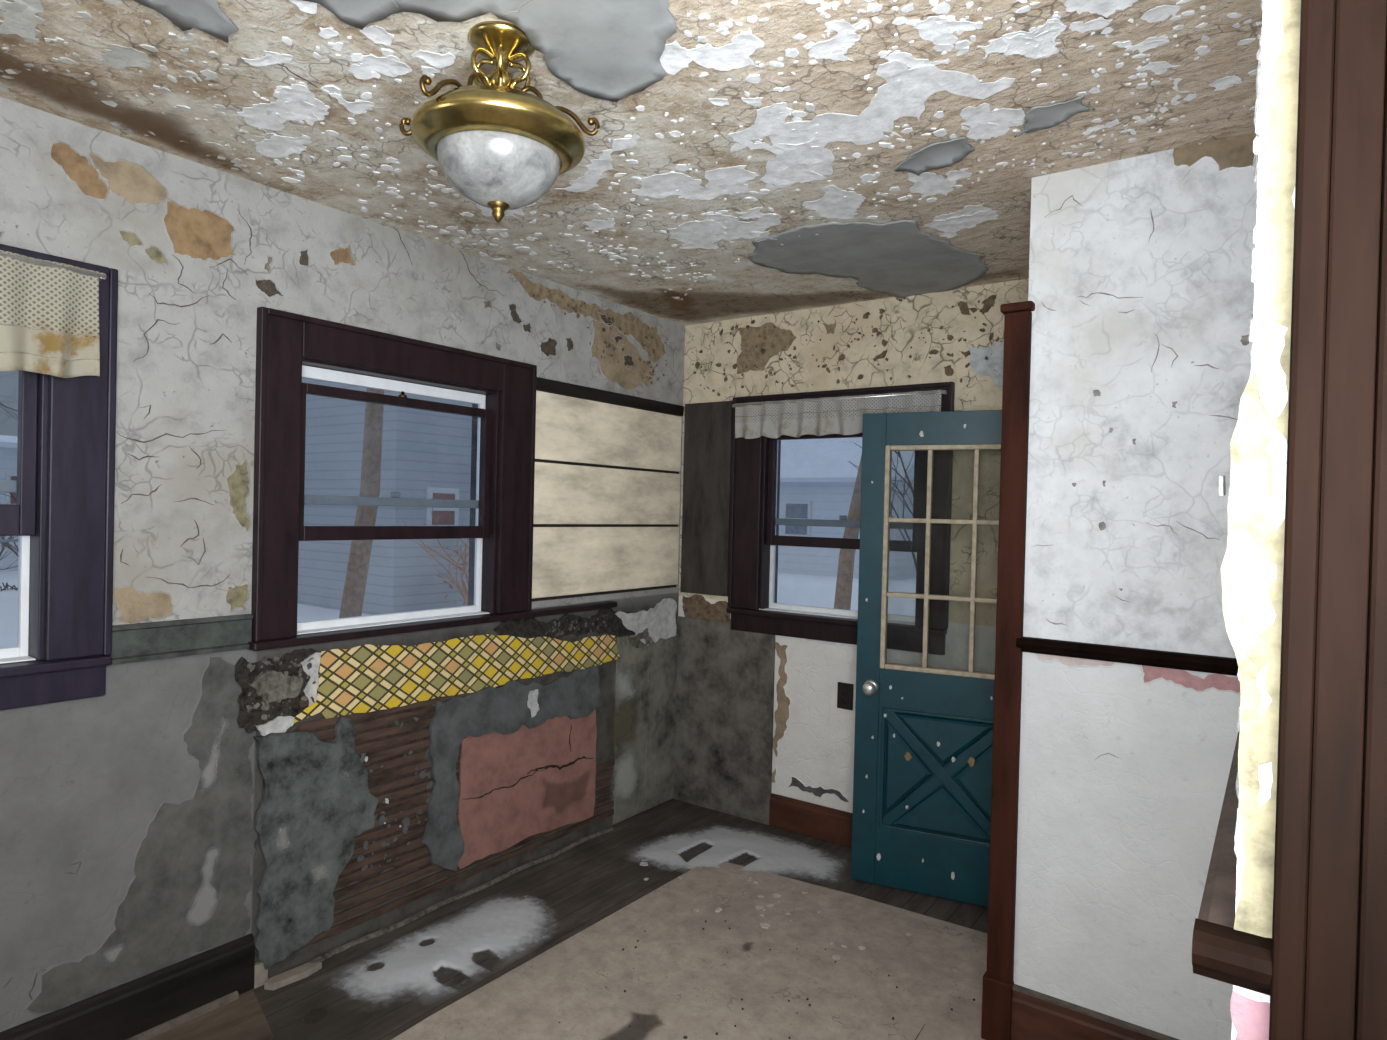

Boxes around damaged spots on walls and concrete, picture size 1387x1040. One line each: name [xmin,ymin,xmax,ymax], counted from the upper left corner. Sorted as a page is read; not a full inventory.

peeling [0,0,155,136]
damp [0,59,209,153]
spalling [49,140,236,266]
spalling [24,648,615,1016]
peeling [1231,991,1270,1040]